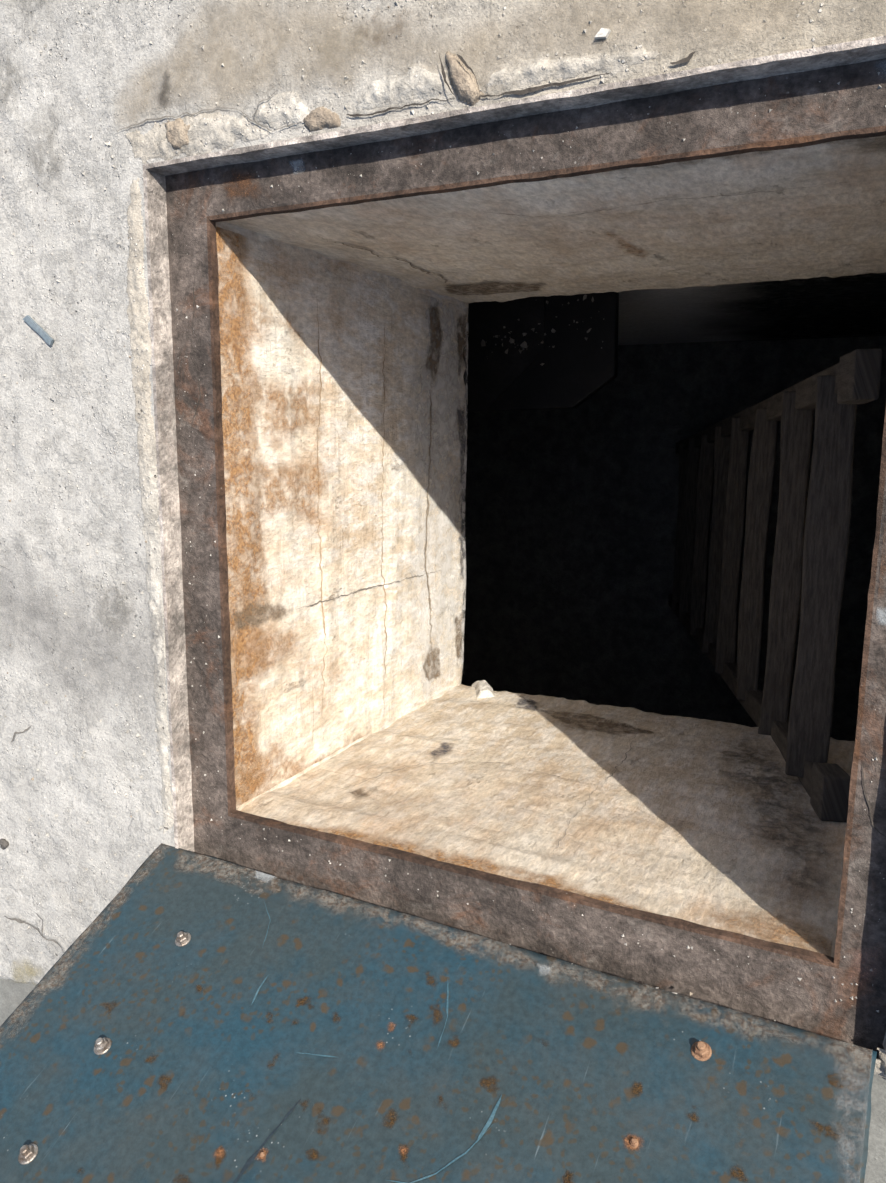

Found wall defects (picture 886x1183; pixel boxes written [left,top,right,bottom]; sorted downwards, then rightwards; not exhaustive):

crack [118,91,304,131]
water stain [143,10,337,103]
crack [347,73,609,117]
crack [670,52,695,65]
crack [298,288,437,710]
rust [206,125,886,969]
rust [11,849,162,1023]